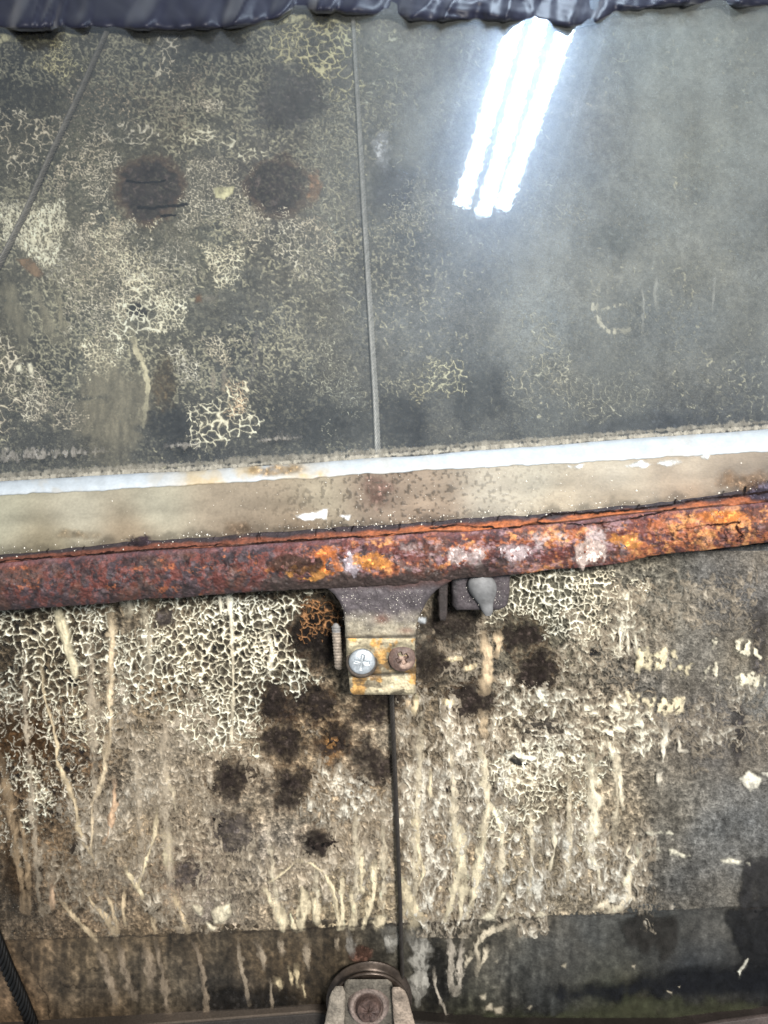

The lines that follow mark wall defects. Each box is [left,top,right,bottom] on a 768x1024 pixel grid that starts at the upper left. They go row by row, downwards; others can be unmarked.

corrosion [0,475,768,610]
water stain [42,609,119,850]
water stain [86,741,176,932]
water stain [218,595,236,742]
water stain [198,948,310,1009]
water stain [263,828,399,952]
water stain [402,755,432,918]
water stain [410,924,509,1012]
water stain [448,635,503,686]
water stain [447,754,506,917]
water stain [586,742,624,843]
water stain [556,846,768,1002]